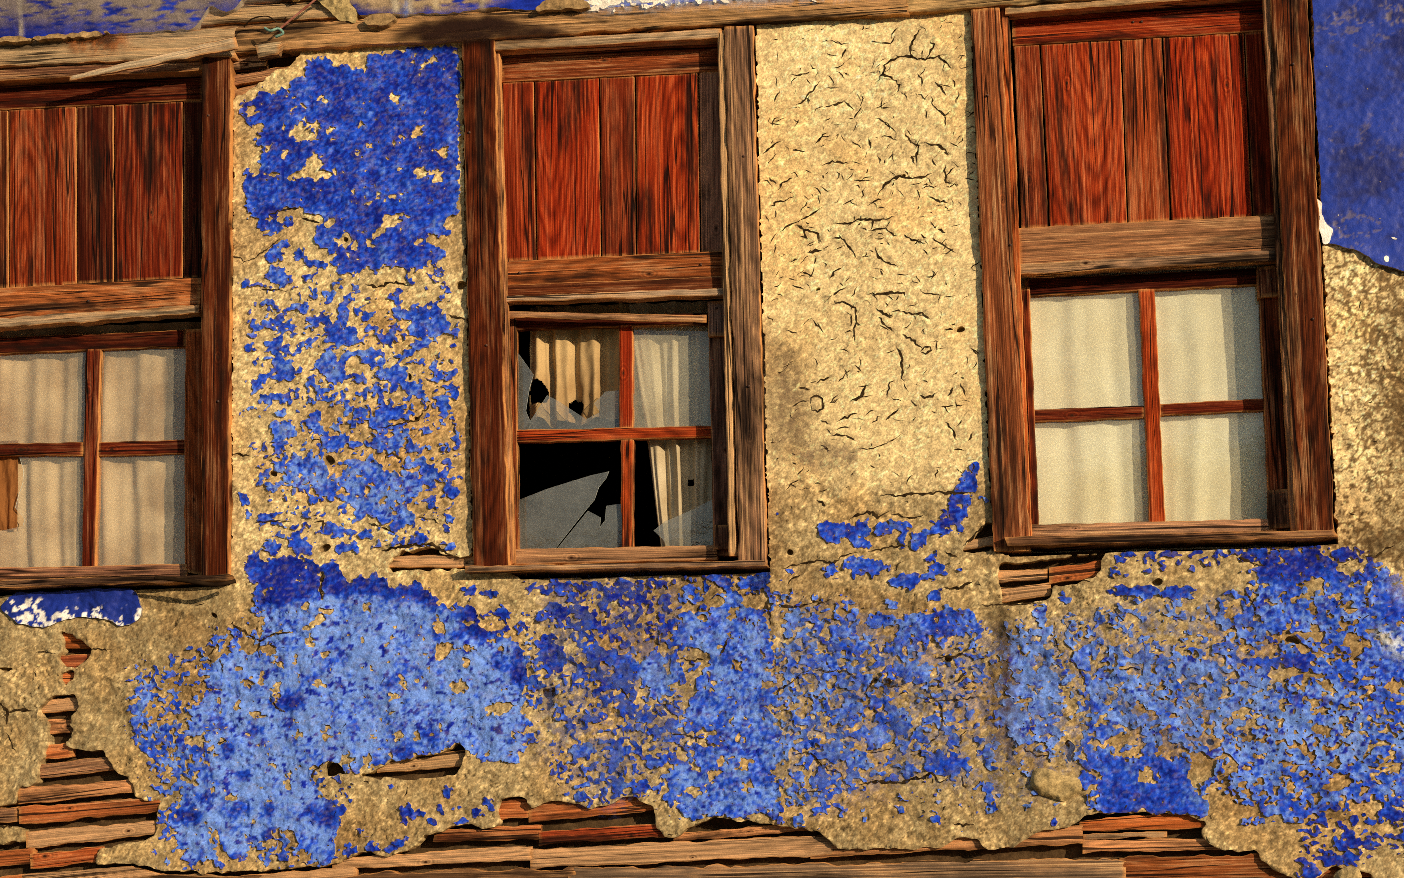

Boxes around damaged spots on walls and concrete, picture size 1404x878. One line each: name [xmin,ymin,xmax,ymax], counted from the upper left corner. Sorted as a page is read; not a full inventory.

peeling [587,0,730,12]
peeling [233,44,473,572]
peeling [0,512,1404,878]
crack [776,640,980,827]
peeling [817,461,989,591]
crack [764,19,1086,684]